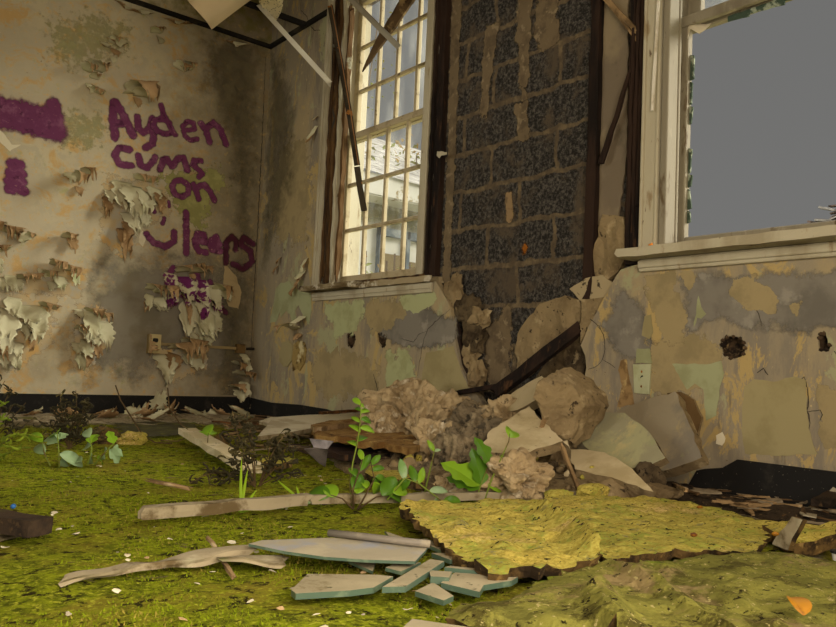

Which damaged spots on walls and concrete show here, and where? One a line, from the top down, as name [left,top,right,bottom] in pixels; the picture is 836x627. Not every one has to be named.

peeling [63,167,174,264]
peeling [266,116,318,274]
peeling [0,221,116,374]
peeling [143,263,242,388]
peeling [228,353,257,403]
peeling [270,258,312,371]
peeling [324,298,366,348]
peeling [398,291,437,314]
peeling [377,332,469,392]
peeling [672,334,747,421]
peeling [729,273,779,315]
flaking render [817,331,832,352]